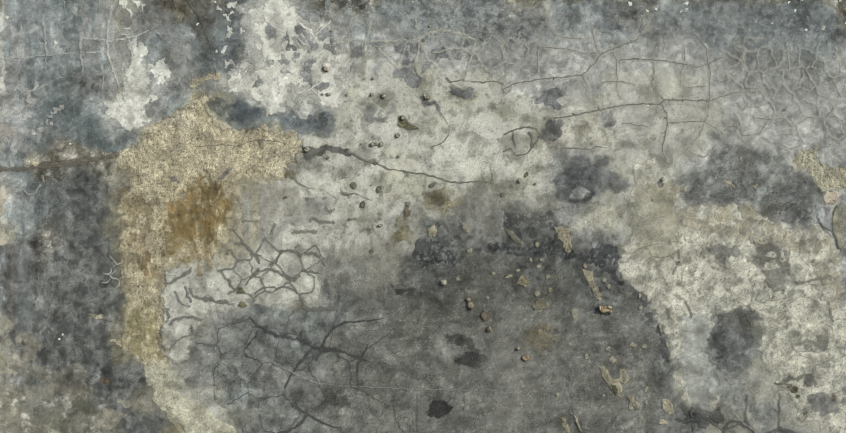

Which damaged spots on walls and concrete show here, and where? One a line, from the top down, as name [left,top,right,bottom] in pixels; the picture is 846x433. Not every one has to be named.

peeling [0,315,87,433]
flaking render [94,0,351,433]
crack [159,167,494,433]
damp [173,178,724,433]
damp [154,0,843,145]
crack [354,22,846,188]
crack [631,243,708,333]
damp [632,92,822,268]
flaking render [617,158,846,433]
damp [706,241,790,373]
crack [675,205,846,433]
flaking render [792,145,846,192]